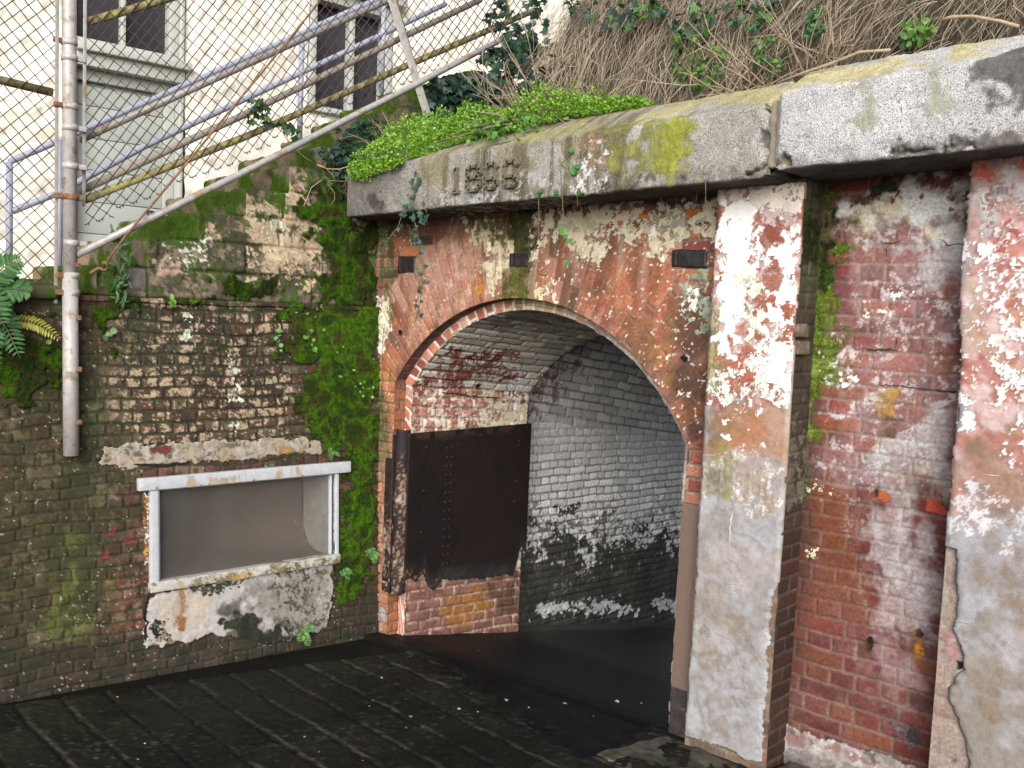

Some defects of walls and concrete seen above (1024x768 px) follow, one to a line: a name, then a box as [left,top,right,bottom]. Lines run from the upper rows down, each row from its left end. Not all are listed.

water stain [629,111,698,205]
spalling [760,130,771,148]
spalling [850,176,902,209]
peeling [460,216,514,297]
peeling [375,296,392,339]
peeling [529,151,804,441]
peeling [863,286,931,318]
peeling [956,199,1024,475]
peeling [412,350,502,406]
peeling [818,351,859,388]
spalling [150,445,171,455]
water stain [528,592,676,622]